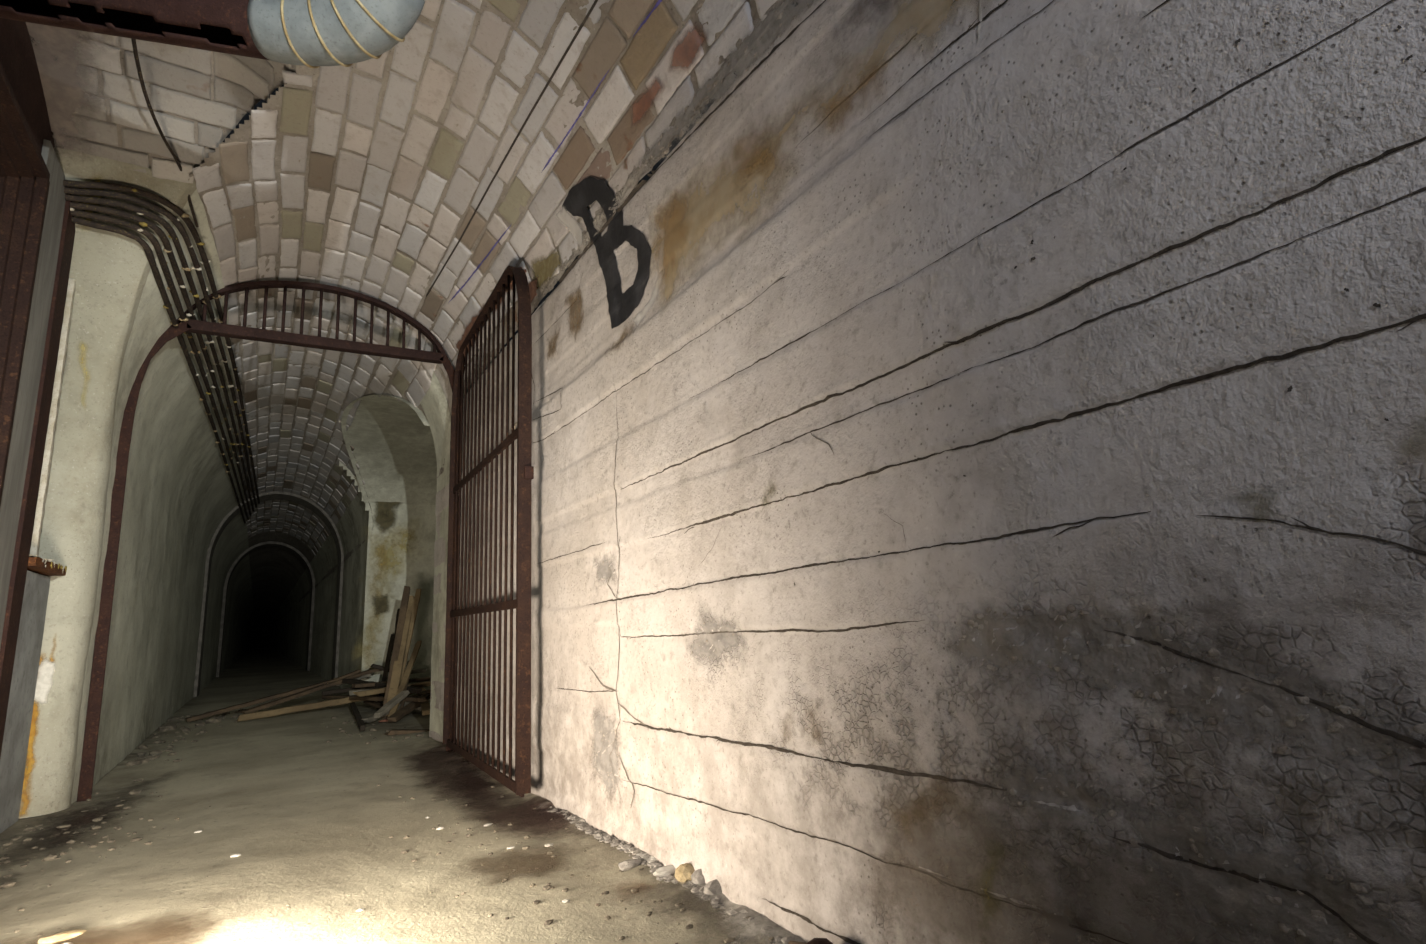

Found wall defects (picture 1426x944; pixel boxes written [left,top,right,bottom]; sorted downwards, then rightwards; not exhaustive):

crack [535,0,826,343]
leakage [652,149,774,298]
crack [689,0,1394,399]
crack [532,136,1426,896]
leakage [673,883,807,944]
leakage [890,789,1191,944]